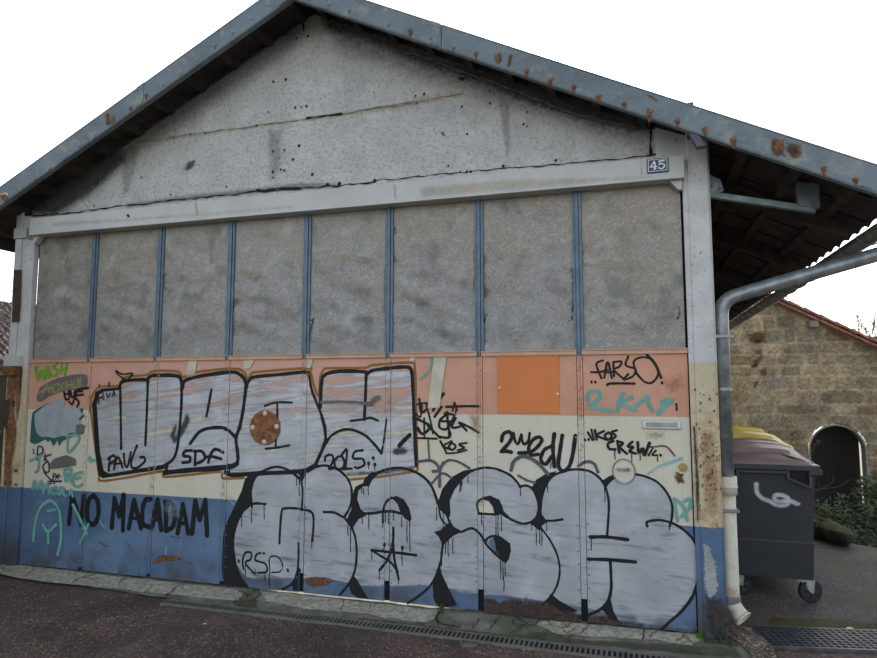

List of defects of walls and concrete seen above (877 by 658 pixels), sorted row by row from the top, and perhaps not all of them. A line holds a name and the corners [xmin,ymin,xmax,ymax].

crack [31,48,656,217]
corrosion [772,139,802,159]
peeling [694,388,723,506]
peeling [703,540,720,598]